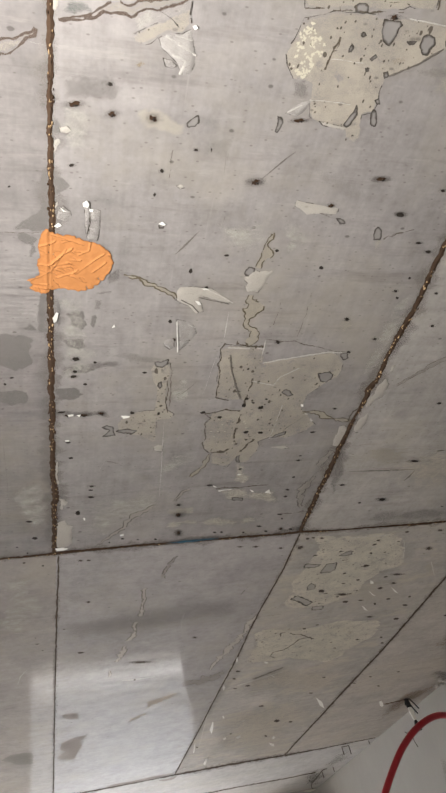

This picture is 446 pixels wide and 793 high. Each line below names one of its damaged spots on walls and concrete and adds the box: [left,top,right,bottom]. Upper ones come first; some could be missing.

crack [58,0,186,22]
crack [0,27,38,56]
peeling [176,286,233,313]
damp [0,270,164,378]
damp [42,388,109,420]
peeling [101,359,174,452]